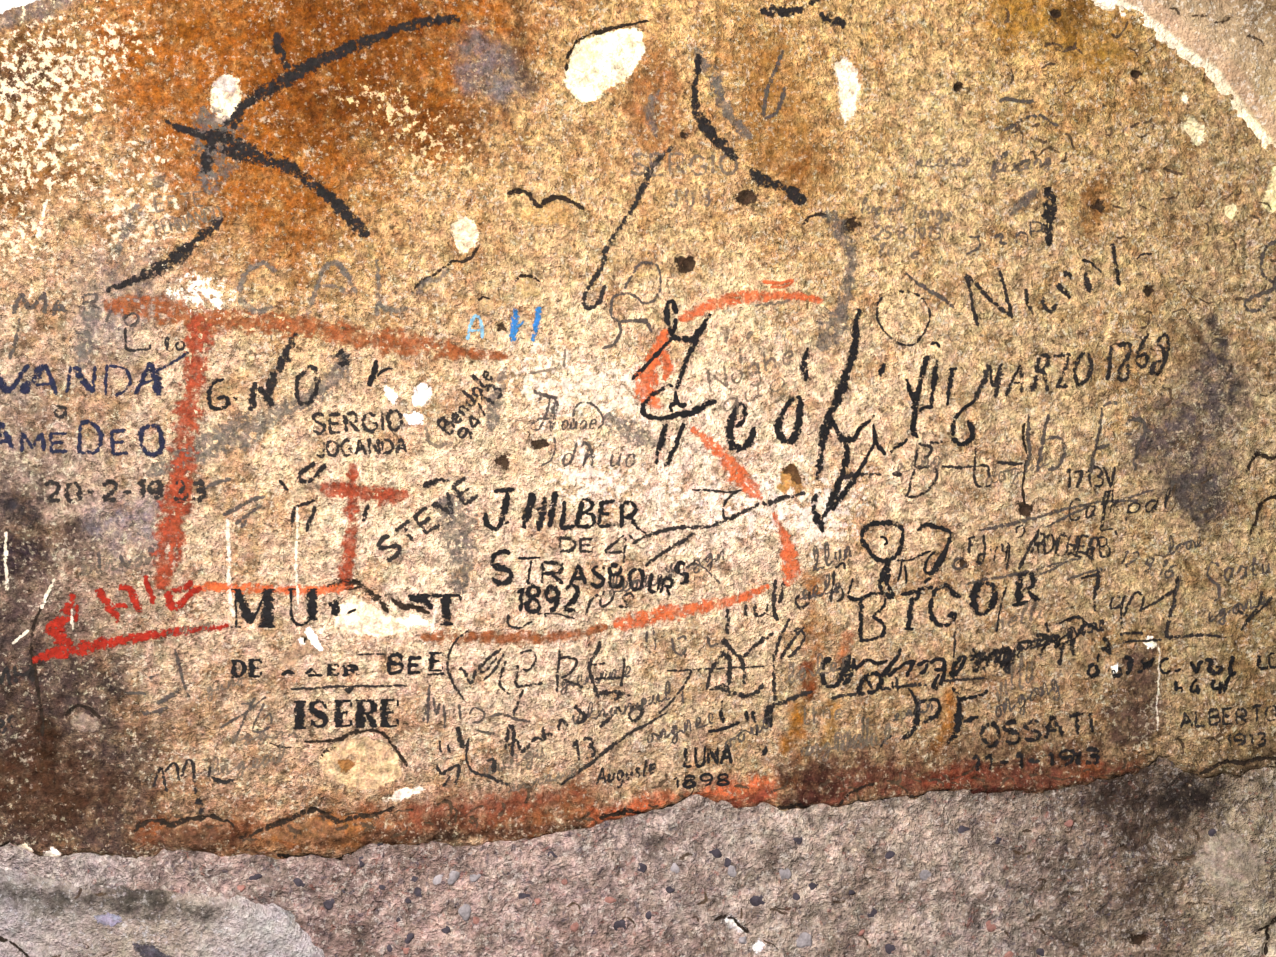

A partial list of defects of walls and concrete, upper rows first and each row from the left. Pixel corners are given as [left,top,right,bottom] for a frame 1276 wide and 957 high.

water stain [0,0,520,324]
water stain [1131,315,1250,526]
spalling [18,843,61,858]
spalling [94,912,122,927]
spalling [725,914,743,933]
spalling [132,943,172,957]
spalling [752,938,765,954]